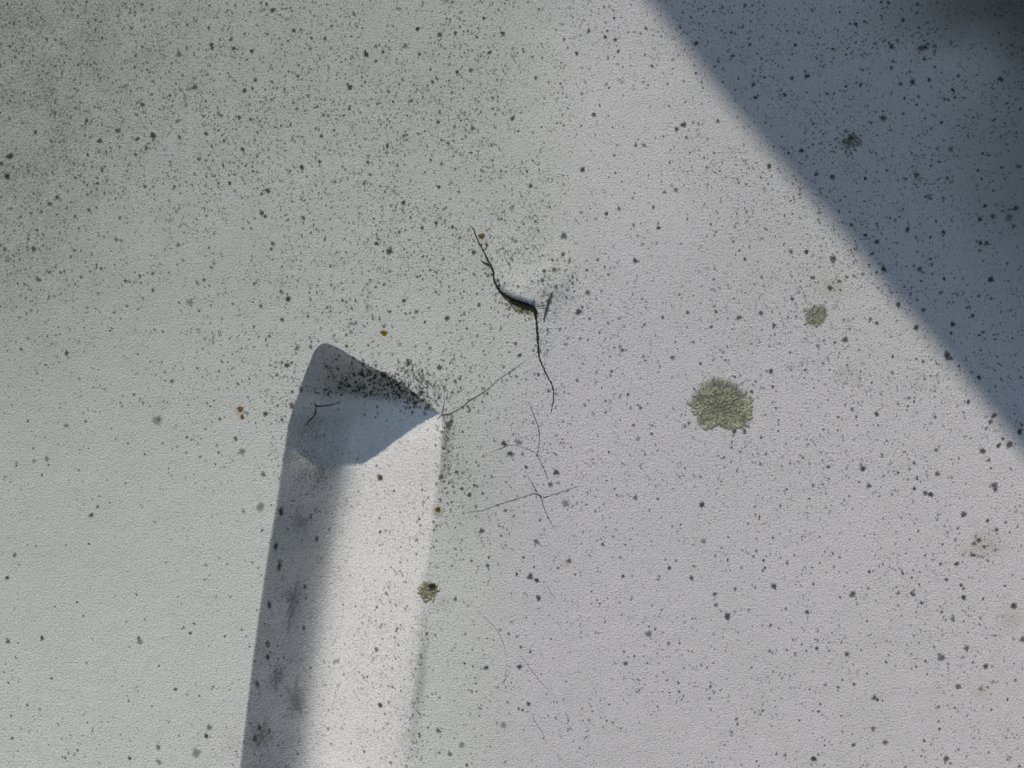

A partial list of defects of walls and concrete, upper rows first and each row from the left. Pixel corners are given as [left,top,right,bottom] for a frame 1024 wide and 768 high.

crack [304,402,340,427]
crack [437,225,578,528]